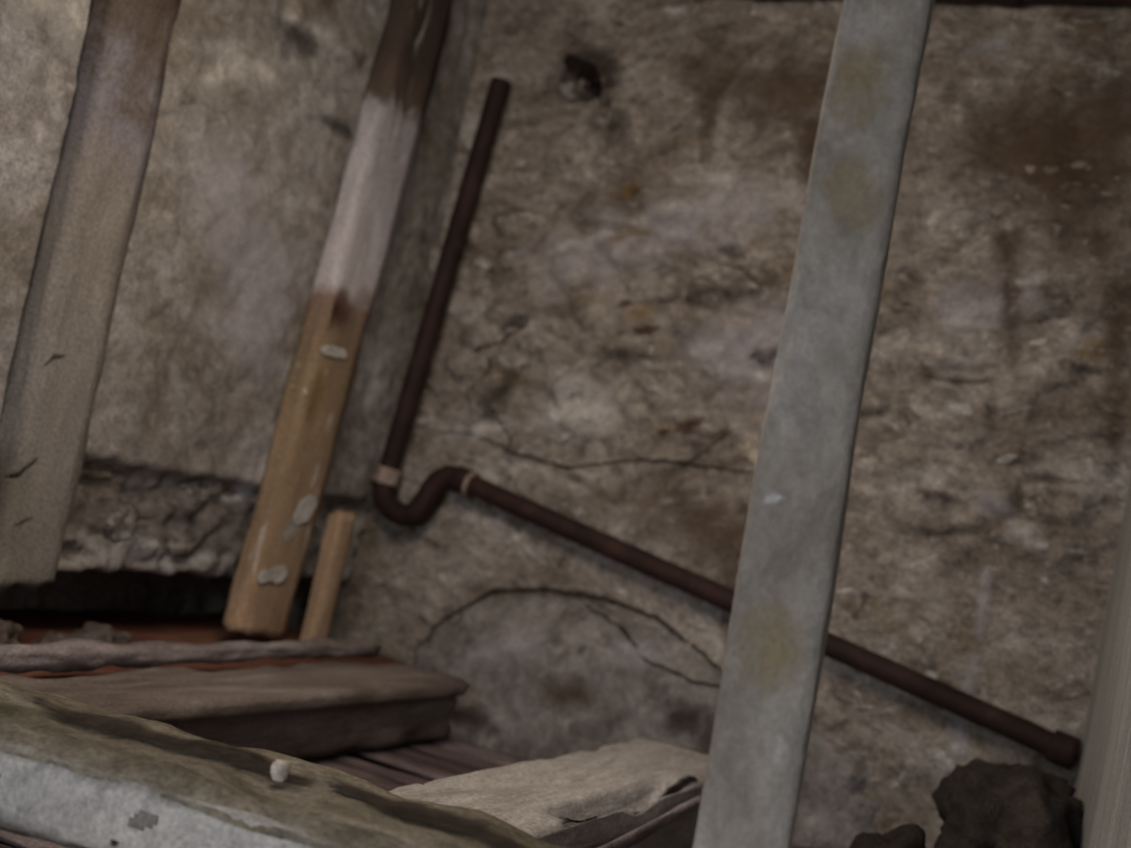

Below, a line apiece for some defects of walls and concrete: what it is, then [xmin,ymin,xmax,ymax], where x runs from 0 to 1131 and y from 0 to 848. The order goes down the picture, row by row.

spalling [560,52,616,102]
damp [982,91,1131,250]
crack [437,317,754,473]
spalling [69,479,252,557]